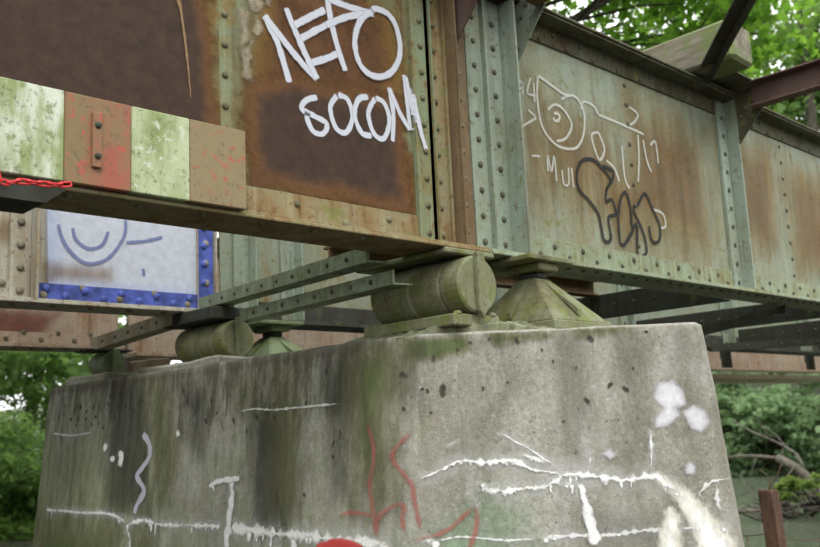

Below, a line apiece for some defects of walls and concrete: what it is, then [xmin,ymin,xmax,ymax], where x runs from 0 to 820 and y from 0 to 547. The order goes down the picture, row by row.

rust [0,0,221,126]
rust [239,0,416,215]
damp [109,376,177,508]
damp [209,476,239,547]
damp [247,371,301,547]
damp [654,380,709,432]
damp [652,472,738,547]